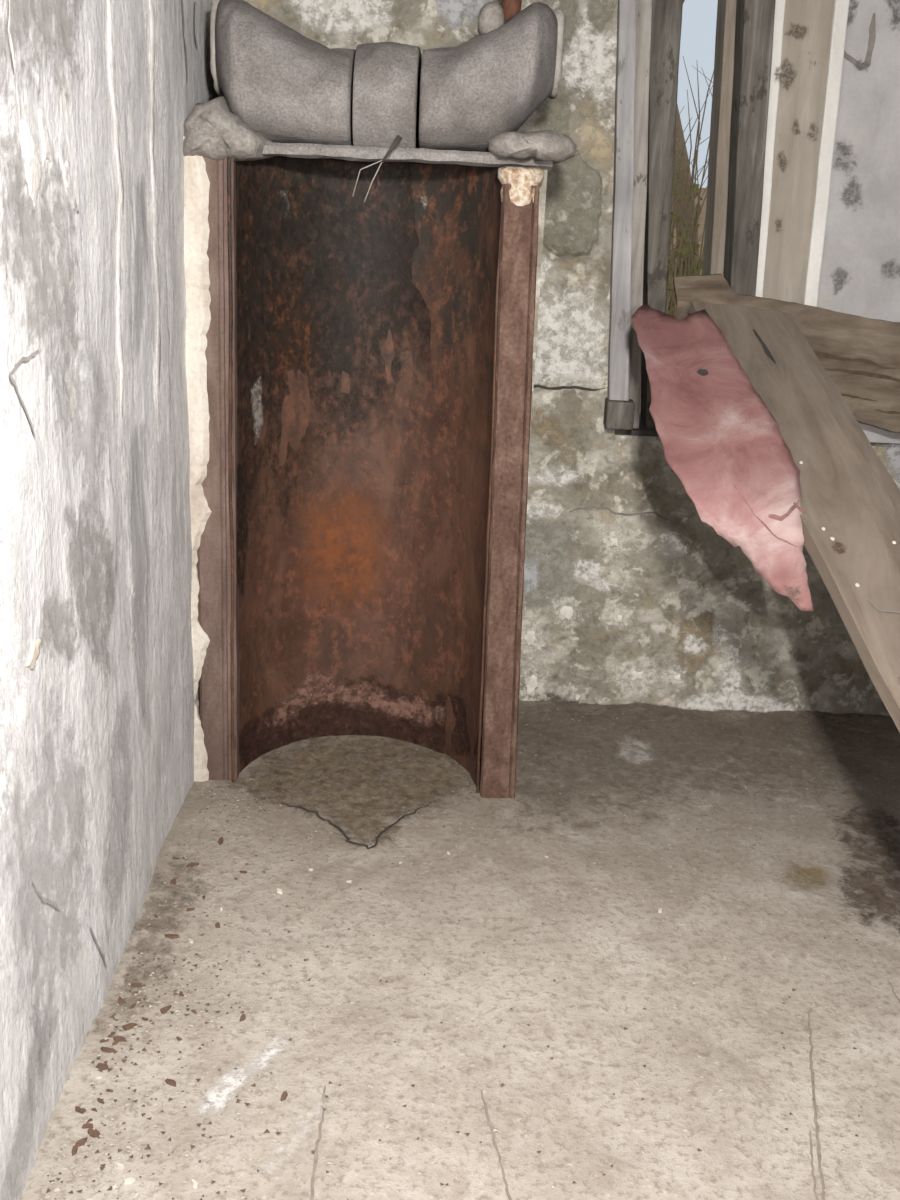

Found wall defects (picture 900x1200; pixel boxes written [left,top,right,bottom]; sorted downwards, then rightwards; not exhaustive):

water stain [834,807,900,933]
crack [310,1085,326,1200]
crack [481,1090,512,1200]
crack [808,1010,825,1200]